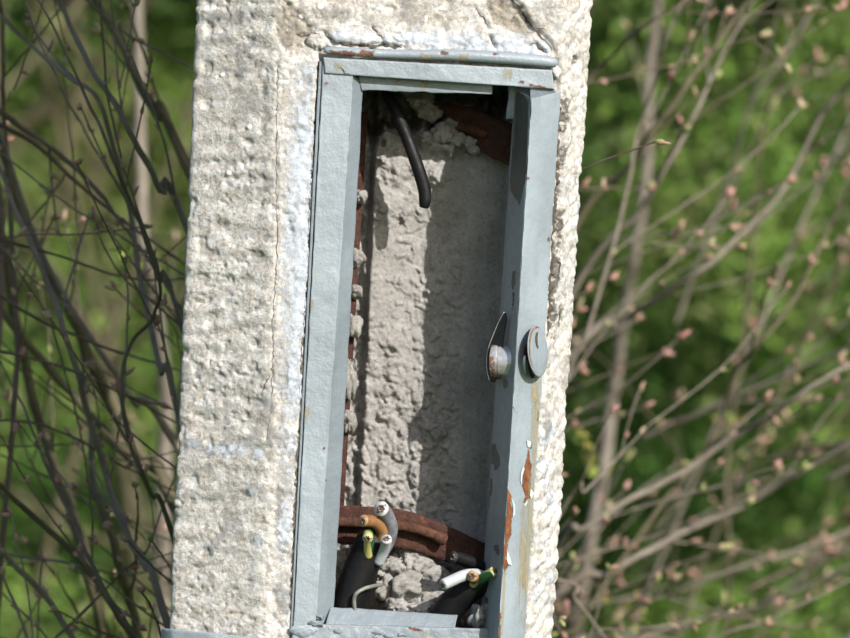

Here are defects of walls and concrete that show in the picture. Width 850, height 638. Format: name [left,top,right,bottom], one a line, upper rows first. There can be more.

crack [511,0,552,53]
rust [391,508,485,563]